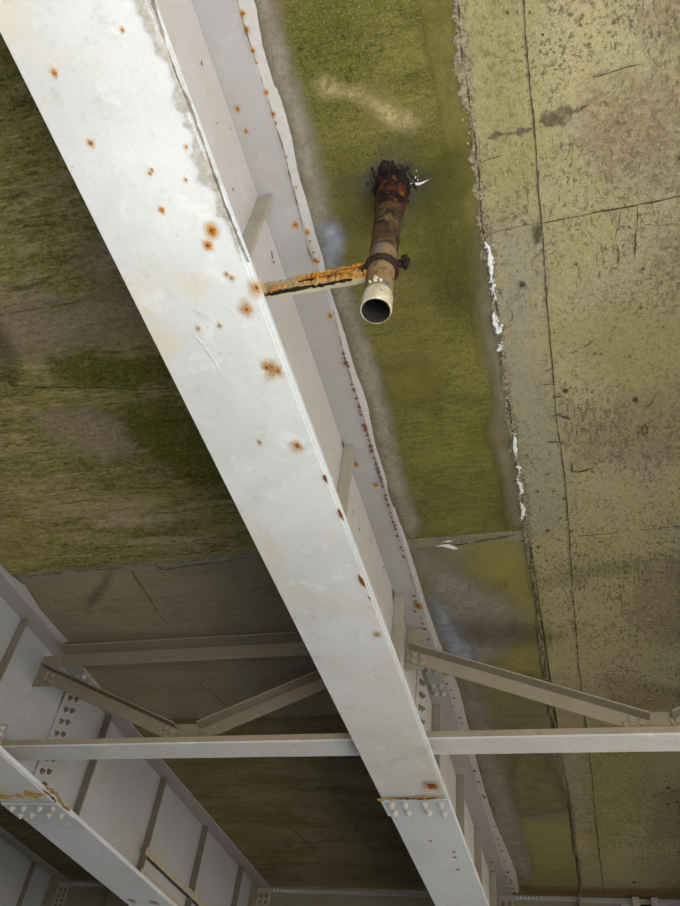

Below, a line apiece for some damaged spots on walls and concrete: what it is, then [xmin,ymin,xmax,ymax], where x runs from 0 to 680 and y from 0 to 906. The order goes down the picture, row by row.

corrosion [204,225,218,249]
corrosion [251,222,367,293]
water stain [420,0,526,530]
corrosion [263,363,281,376]
corrosion [0,786,70,811]
corrosion [378,783,445,801]